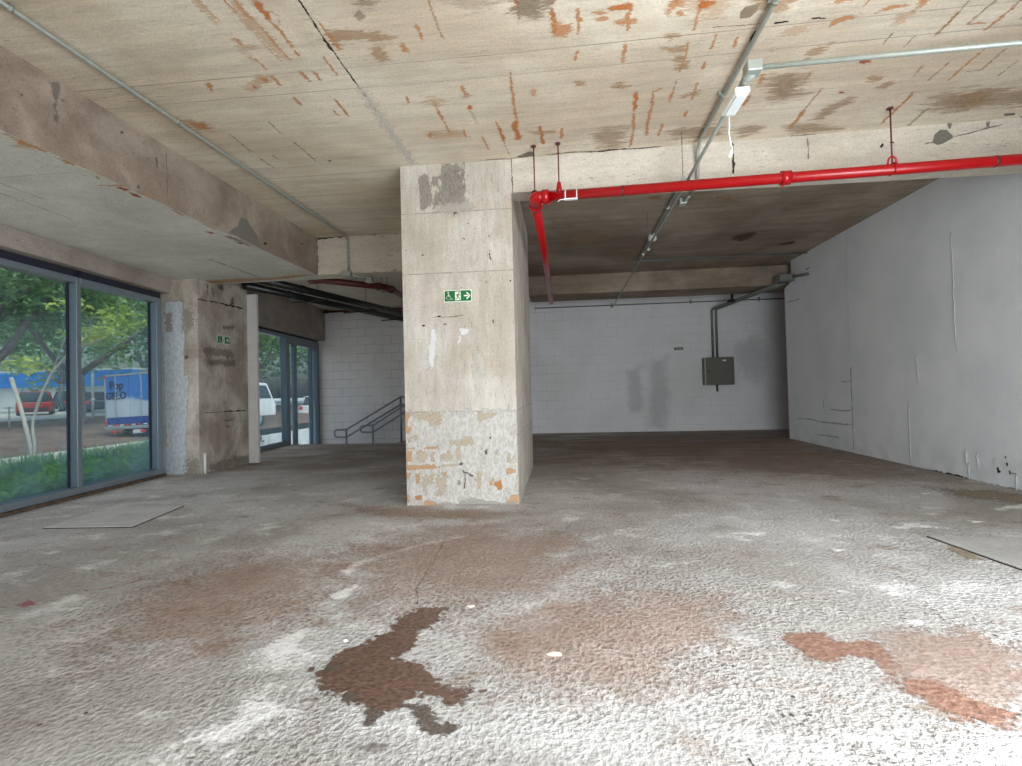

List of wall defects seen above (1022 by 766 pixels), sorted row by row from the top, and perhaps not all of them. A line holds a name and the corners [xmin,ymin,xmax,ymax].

rust [224,0,300,60]
damp [510,0,555,20]
rust [548,2,637,38]
crack [298,0,414,164]
rust [495,82,522,141]
rust [629,88,674,147]
peeling [405,408,519,505]
crack [415,539,445,605]
damp [143,607,488,766]